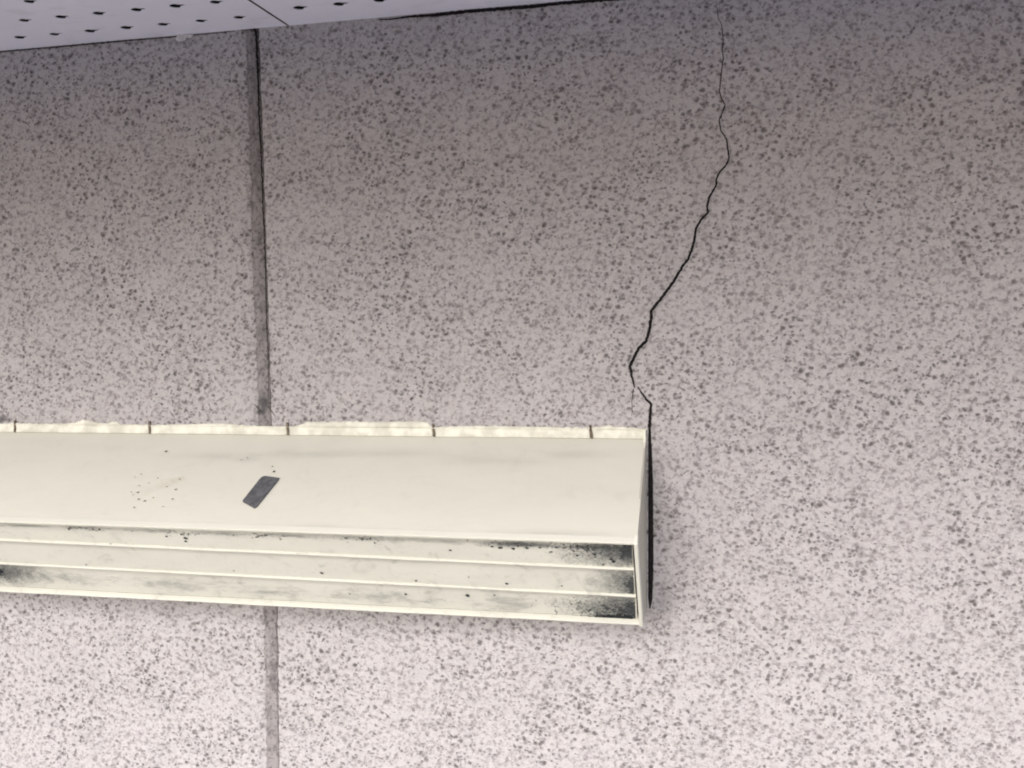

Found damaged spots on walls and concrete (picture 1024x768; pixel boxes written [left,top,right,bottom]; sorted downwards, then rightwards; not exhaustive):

crack [627,4,732,425]